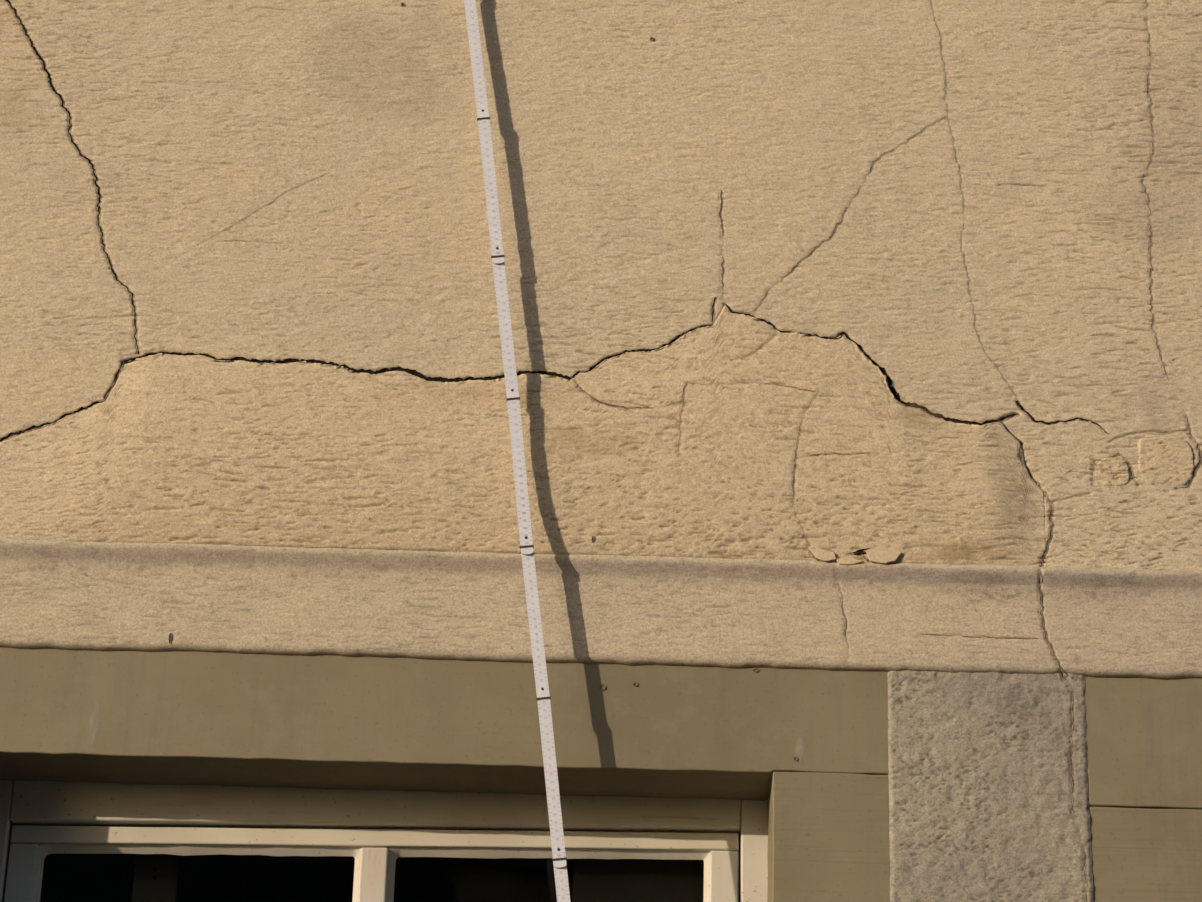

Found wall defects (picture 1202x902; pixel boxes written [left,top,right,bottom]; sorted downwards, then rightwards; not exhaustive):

crack [0,0,505,442]
crack [1141,0,1168,379]
crack [516,0,1108,902]
spalling [808,547,901,565]